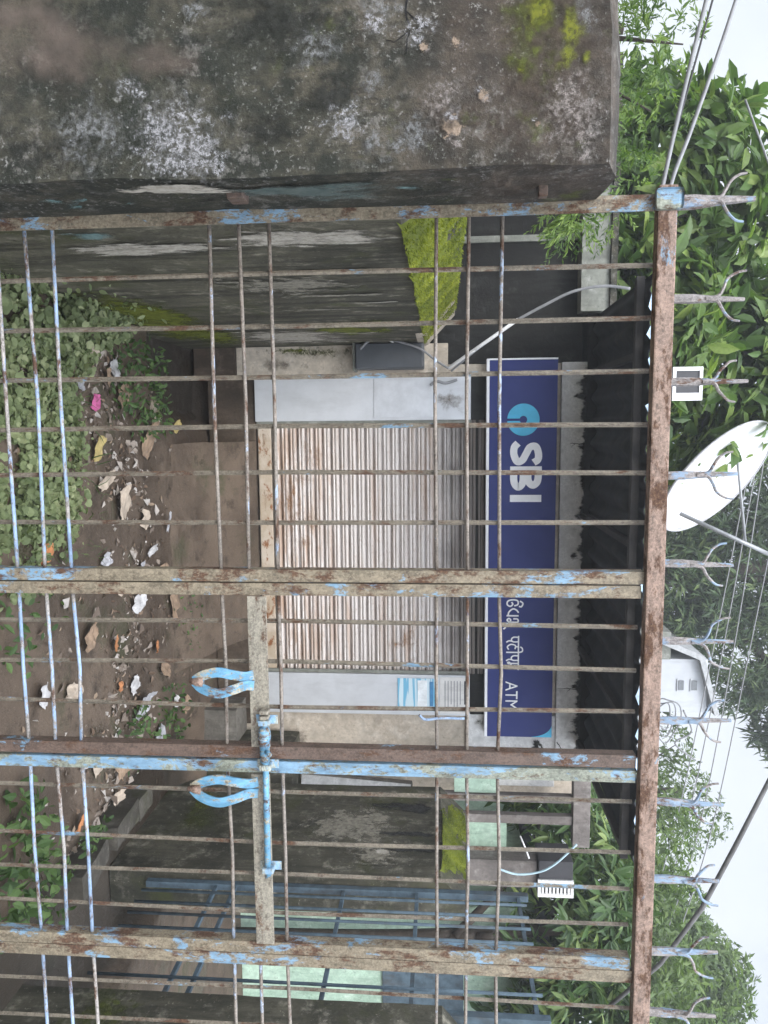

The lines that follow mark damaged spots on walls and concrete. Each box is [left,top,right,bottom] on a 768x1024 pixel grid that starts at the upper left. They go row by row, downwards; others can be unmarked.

leakage [7,104,115,168]
leakage [118,83,226,176]
leakage [299,72,378,139]
leakage [394,122,422,150]
peeling [61,230,402,256]
leakage [380,832,434,852]